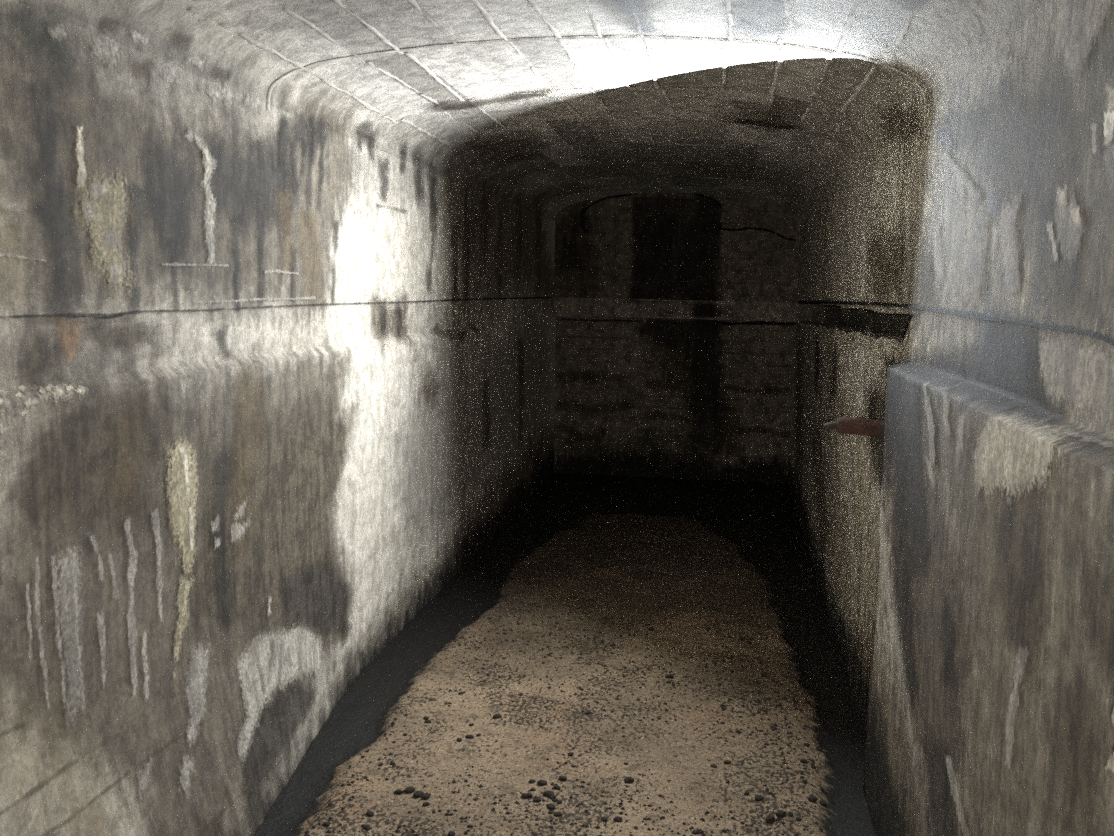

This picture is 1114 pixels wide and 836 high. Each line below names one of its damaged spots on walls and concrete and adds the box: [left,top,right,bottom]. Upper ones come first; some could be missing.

leakage [605,0,656,35]
leakage [734,0,797,38]
leakage [0,36,438,318]
leakage [452,173,596,305]
crack [0,297,1114,344]
leakage [0,195,1114,836]